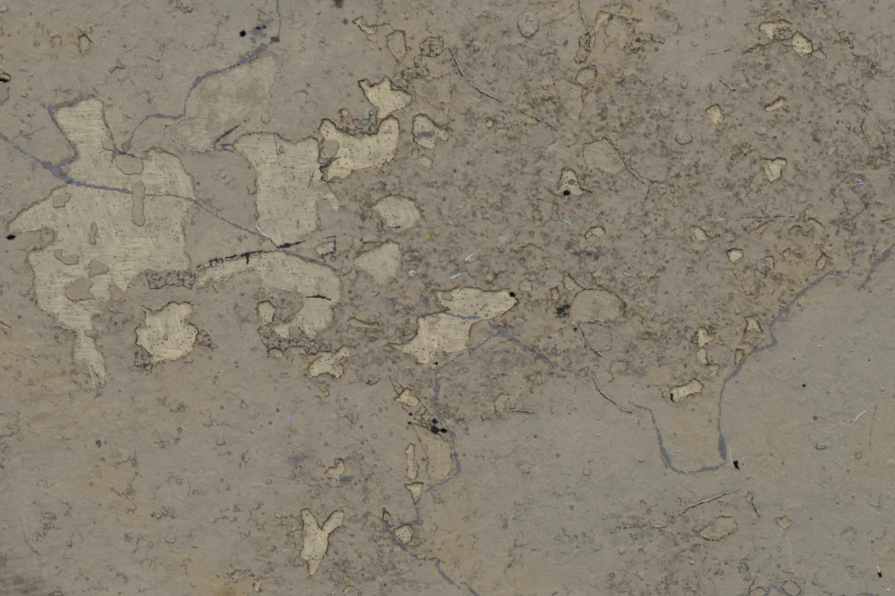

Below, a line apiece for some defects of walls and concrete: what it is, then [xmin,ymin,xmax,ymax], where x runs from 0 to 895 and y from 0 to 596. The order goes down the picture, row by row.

peeling [7,95,199,386]
crack [0,0,348,275]
crack [306,293,331,301]
peeling [300,506,344,576]
peeling [164,46,505,378]
peeling [405,424,453,504]
peeling [391,279,532,364]
crack [381,297,595,596]
crack [628,244,895,474]
crack [764,584,791,596]